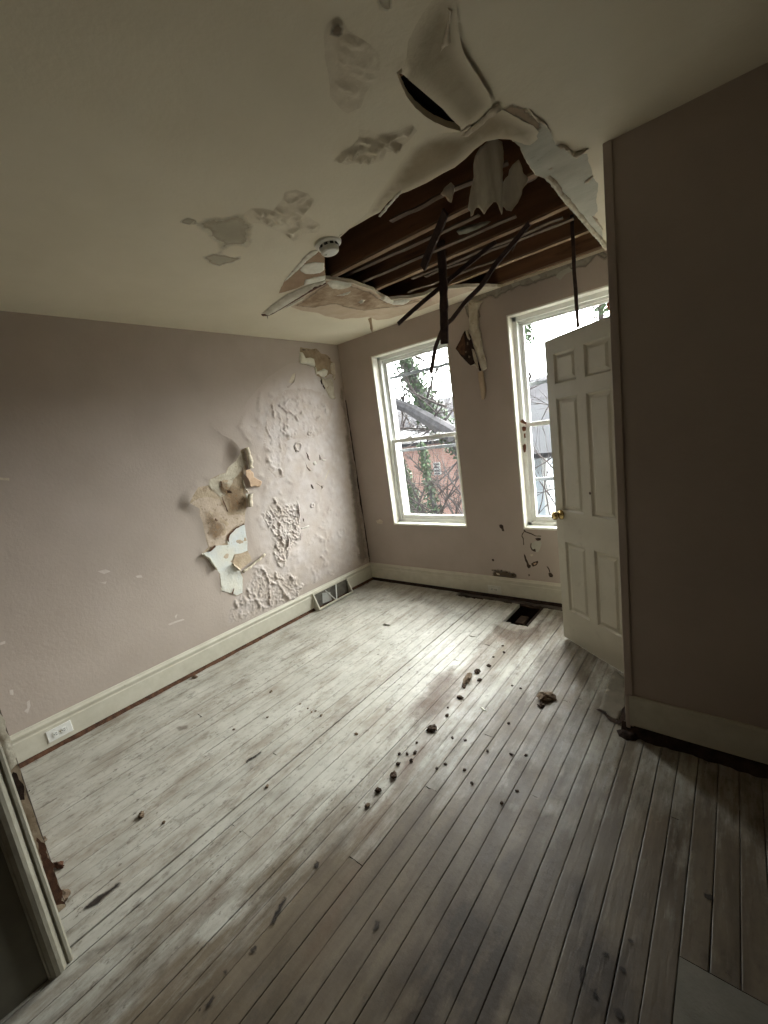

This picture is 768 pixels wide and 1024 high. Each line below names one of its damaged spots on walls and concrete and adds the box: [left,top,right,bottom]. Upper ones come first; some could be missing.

spalling [401,75,454,122]
peeling [558,144,589,159]
spalling [545,168,607,248]
peeling [288,347,336,399]
peeling [174,422,266,596]
peeling [524,538,553,577]
spalling [0,714,66,912]